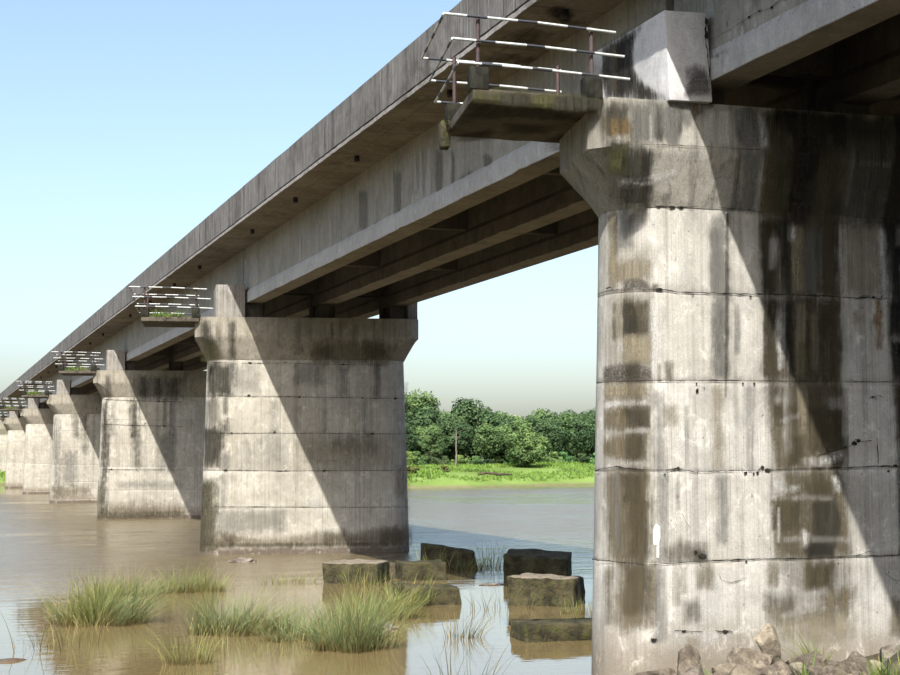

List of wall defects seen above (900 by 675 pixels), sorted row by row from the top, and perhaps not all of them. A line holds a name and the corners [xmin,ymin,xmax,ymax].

water stain [601,27,711,143]
crack [691,1,779,77]
water stain [609,152,674,285]
water stain [203,322,235,467]
water stain [604,382,650,460]
water stain [613,301,661,368]
water stain [711,218,739,378]
crack [595,439,900,475]
crack [642,288,900,300]
water stain [738,106,900,639]
water stain [607,470,656,629]